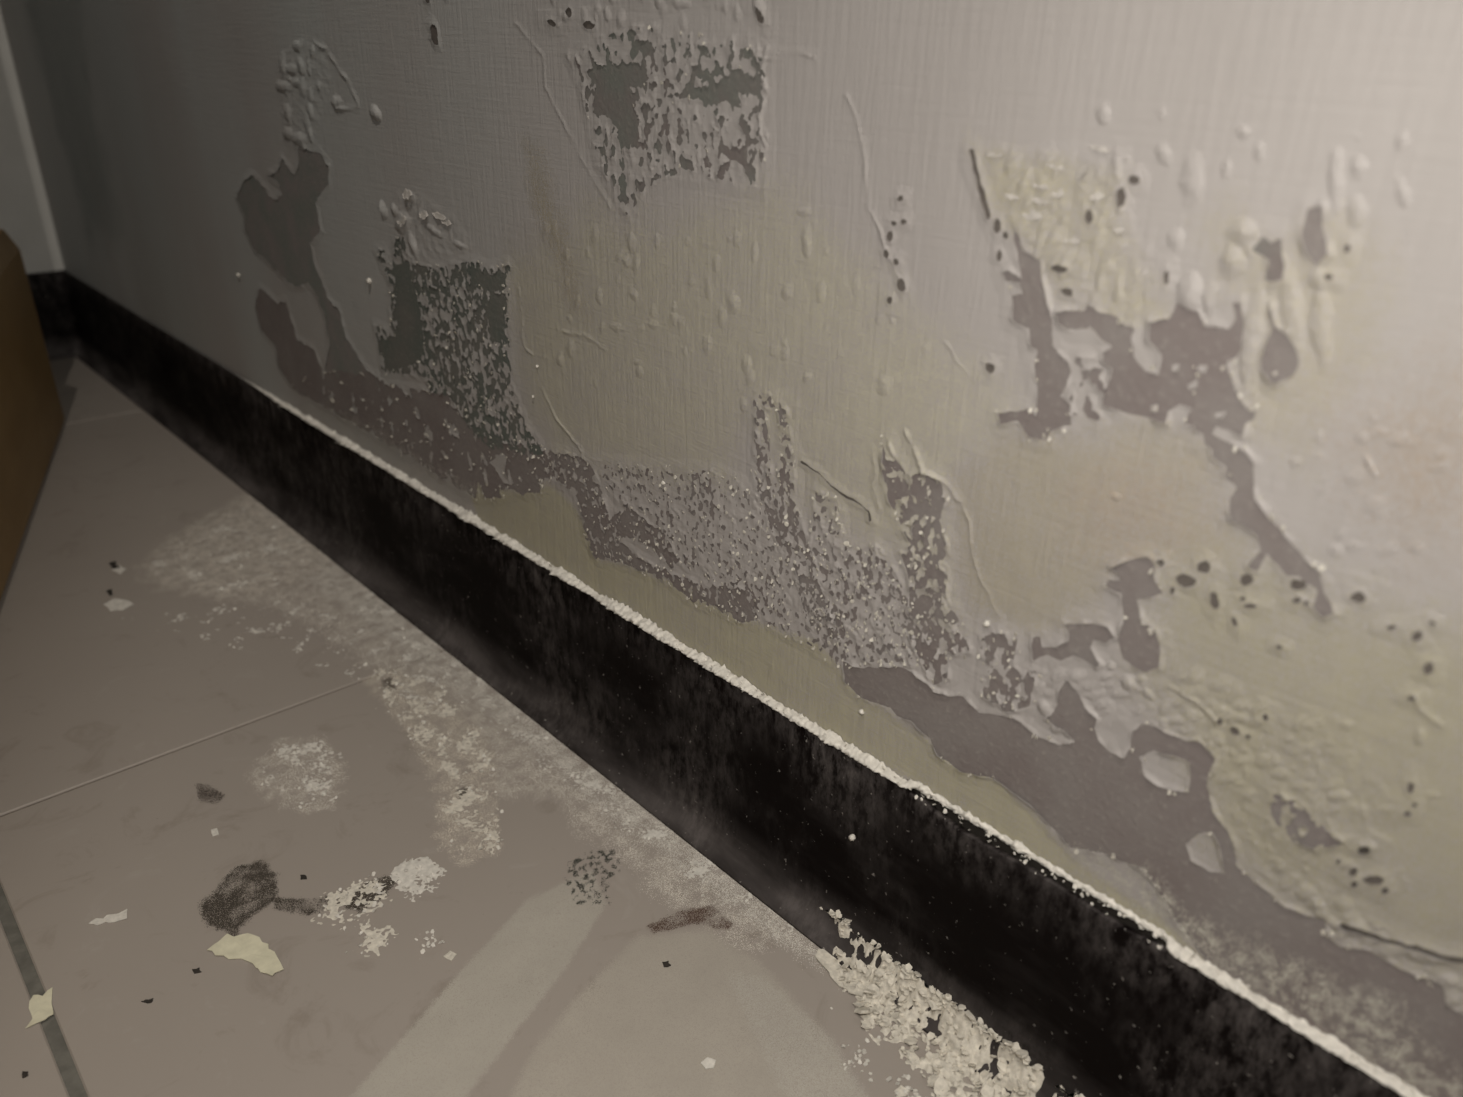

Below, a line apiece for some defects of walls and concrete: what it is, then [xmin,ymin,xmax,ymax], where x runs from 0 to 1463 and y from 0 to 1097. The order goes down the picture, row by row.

peeling [541,0,777,224]
peeling [233,143,1463,1097]
water stain [296,121,1463,1097]